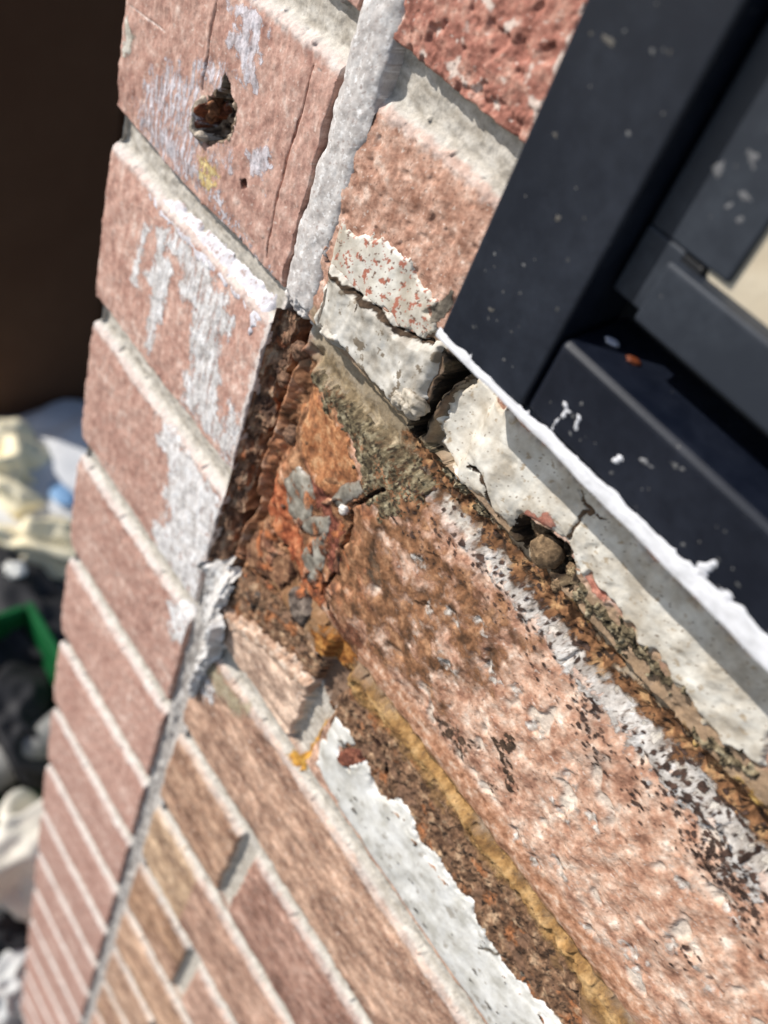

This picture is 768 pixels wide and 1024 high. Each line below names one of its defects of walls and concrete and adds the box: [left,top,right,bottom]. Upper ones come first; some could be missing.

spalling [188,74,237,146]
crack [328,260,436,344]
rust [207,308,364,670]
peeling [314,219,768,780]
spalling [221,557,334,693]
rust [401,429,768,844]
rust [287,716,331,771]
rust [337,748,366,767]
spalling [549,796,600,832]